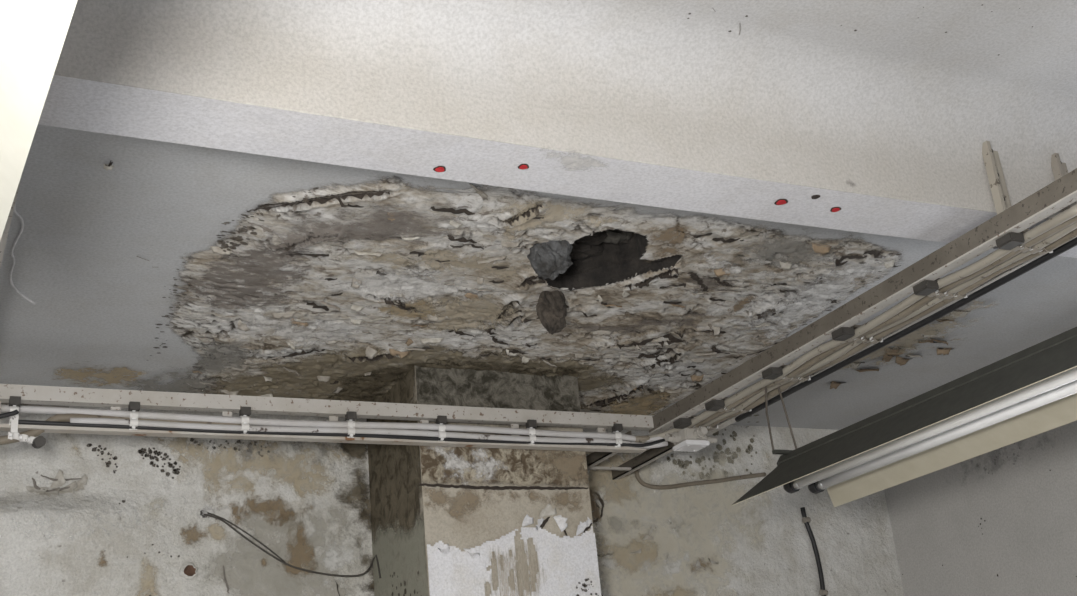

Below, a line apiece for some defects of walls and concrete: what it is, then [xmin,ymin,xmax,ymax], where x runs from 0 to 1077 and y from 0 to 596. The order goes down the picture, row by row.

spalling [169,176,902,416]
damp [75,443,118,473]
damp [138,437,498,596]
damp [366,418,436,430]
peeling [420,433,605,596]
damp [511,415,768,596]